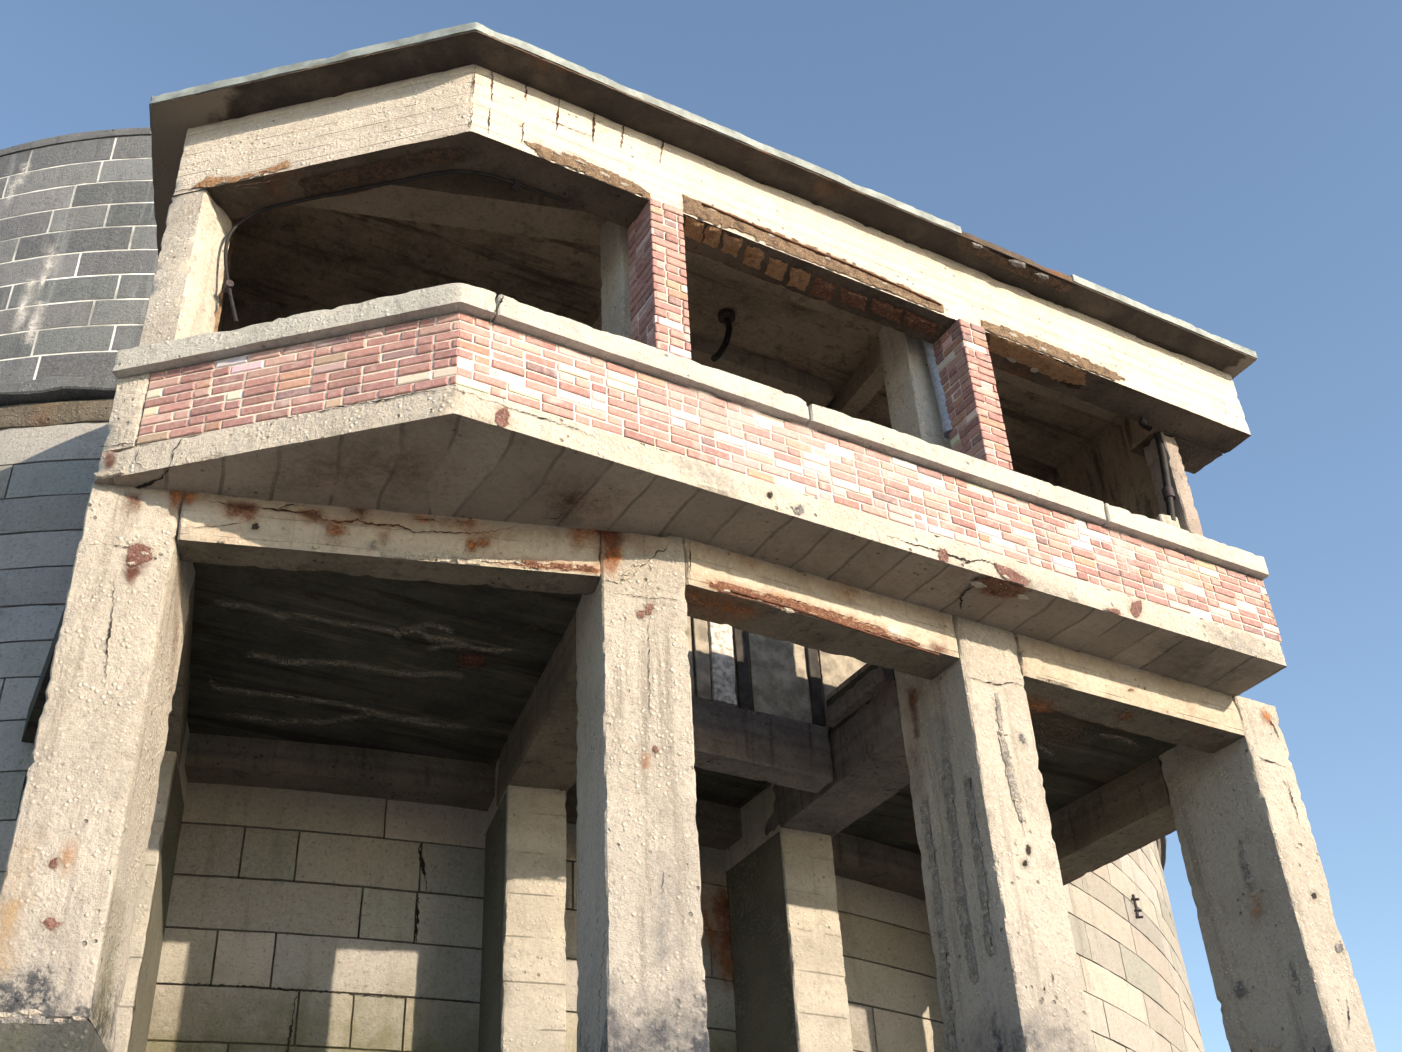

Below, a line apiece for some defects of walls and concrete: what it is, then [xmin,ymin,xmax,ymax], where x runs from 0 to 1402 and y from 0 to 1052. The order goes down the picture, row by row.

spalling [194,160,291,187]
spalling [524,140,651,199]
spalling [682,194,944,313]
spalling [981,320,1126,389]
corrosion [229,503,254,516]
crack [190,502,562,534]
crack [83,543,153,684]
crack [414,844,427,942]